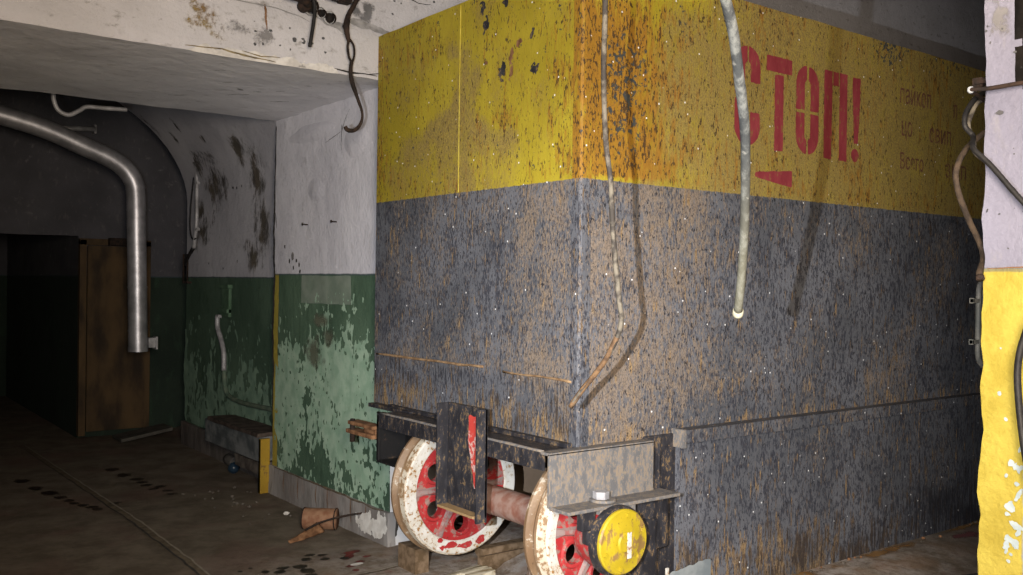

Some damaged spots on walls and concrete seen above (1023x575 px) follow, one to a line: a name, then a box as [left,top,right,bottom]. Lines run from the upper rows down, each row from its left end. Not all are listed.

water stain [193,136,227,247]
water stain [231,136,269,270]
peeling [184,293,391,539]
peeling [1003,447,1023,563]